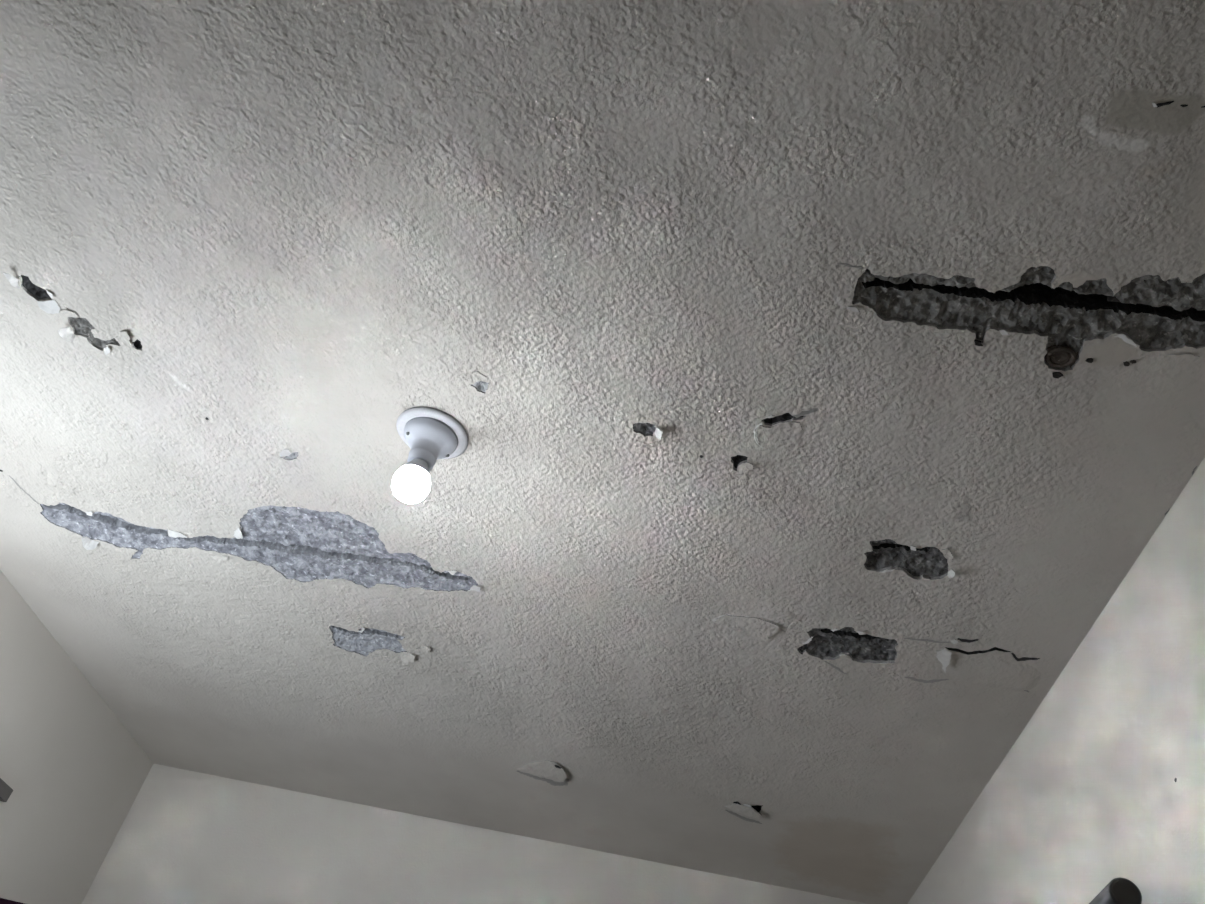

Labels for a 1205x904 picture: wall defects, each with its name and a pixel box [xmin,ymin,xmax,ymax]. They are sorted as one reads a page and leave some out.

flaking render [3,272,199,398]
spalling [826,263,1205,378]
flaking render [633,423,663,440]
spalling [763,413,804,424]
flaking render [731,455,754,473]
spalling [40,503,481,592]
spalling [864,539,955,580]
spalling [329,626,431,663]
spalling [798,627,898,674]
crack [904,638,1040,683]